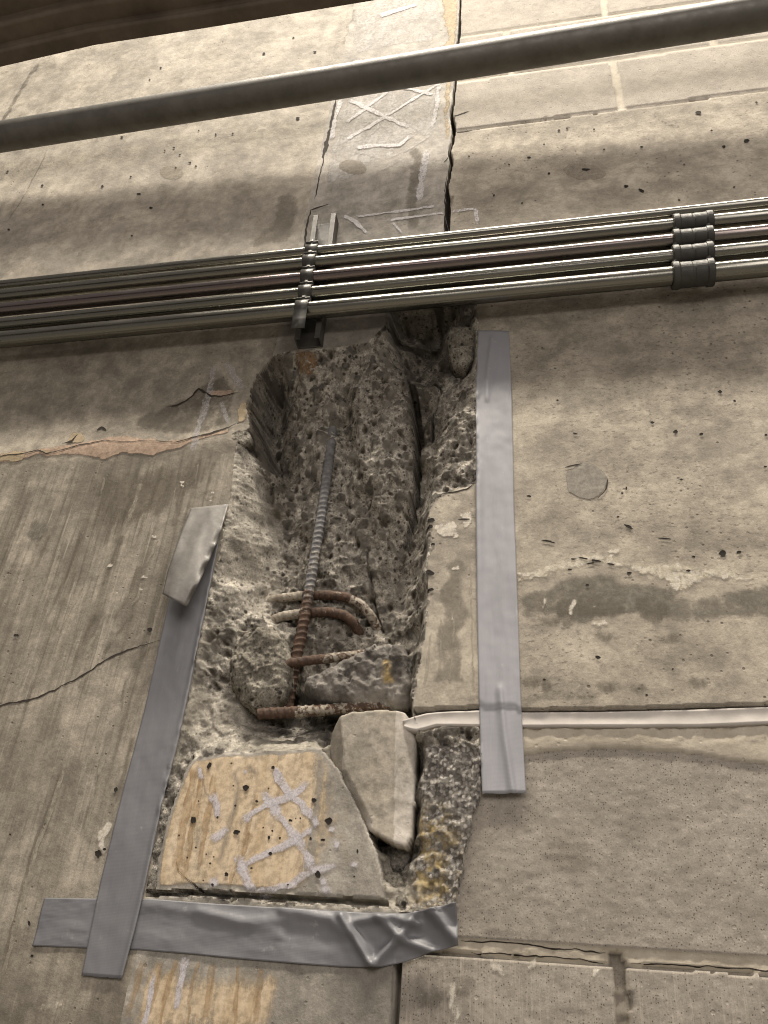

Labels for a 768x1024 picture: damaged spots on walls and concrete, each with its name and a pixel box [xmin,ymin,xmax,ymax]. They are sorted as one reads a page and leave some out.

crack [442,0,461,46]
crack [444,81,479,232]
spalling [0,304,482,913]
leakage [518,549,768,636]
crack [0,640,159,707]
crack [465,941,603,964]
crack [639,963,768,972]